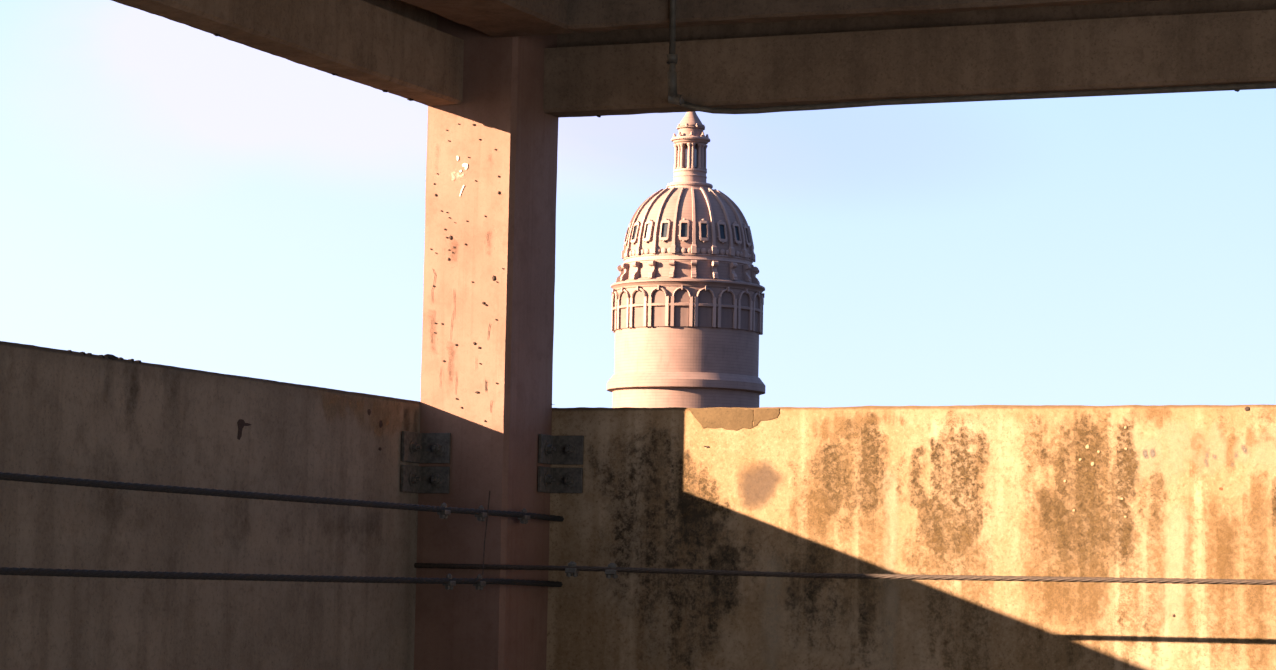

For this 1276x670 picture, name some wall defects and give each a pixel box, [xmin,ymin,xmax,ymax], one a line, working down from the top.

water stain [592,430,746,666]
peeling [688,408,780,431]
water stain [743,466,779,505]
water stain [766,410,988,670]
water stain [1023,413,1276,669]